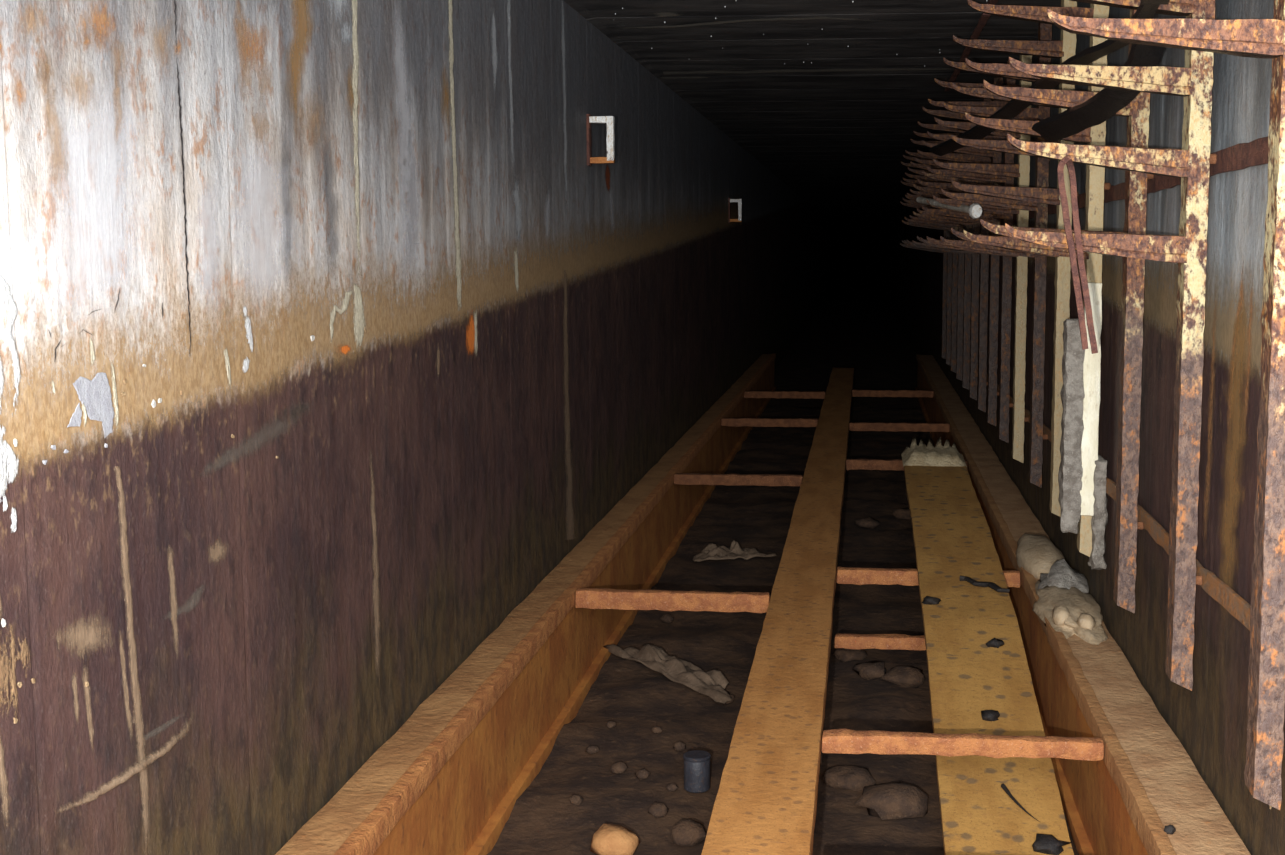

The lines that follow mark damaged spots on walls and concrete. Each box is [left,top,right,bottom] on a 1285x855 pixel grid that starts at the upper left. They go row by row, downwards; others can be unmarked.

corrosion [291,0,311,111]
water stain [0,0,741,540]
water stain [1143,262,1178,333]
water stain [1203,280,1263,372]
peeling [67,338,119,448]
water stain [901,436,967,467]
water stain [57,466,149,840]
water stain [168,551,202,654]
water stain [210,540,227,562]